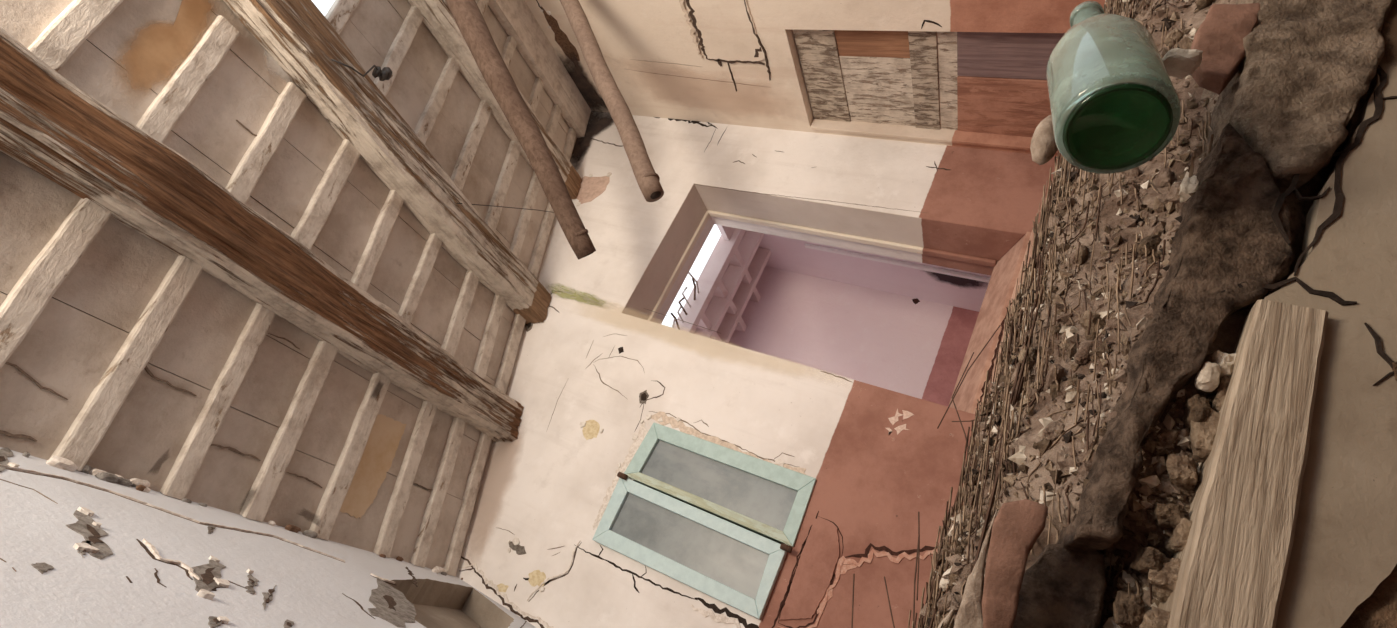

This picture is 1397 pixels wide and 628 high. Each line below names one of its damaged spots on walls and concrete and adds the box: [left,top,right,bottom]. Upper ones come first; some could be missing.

damp [120,0,212,89]
crack [629,0,771,92]
crack [1221,65,1397,386]
crack [547,308,797,467]
flaking render [31,562,54,574]
flaking render [66,507,114,560]
flaking render [191,556,276,628]
crack [694,516,938,628]